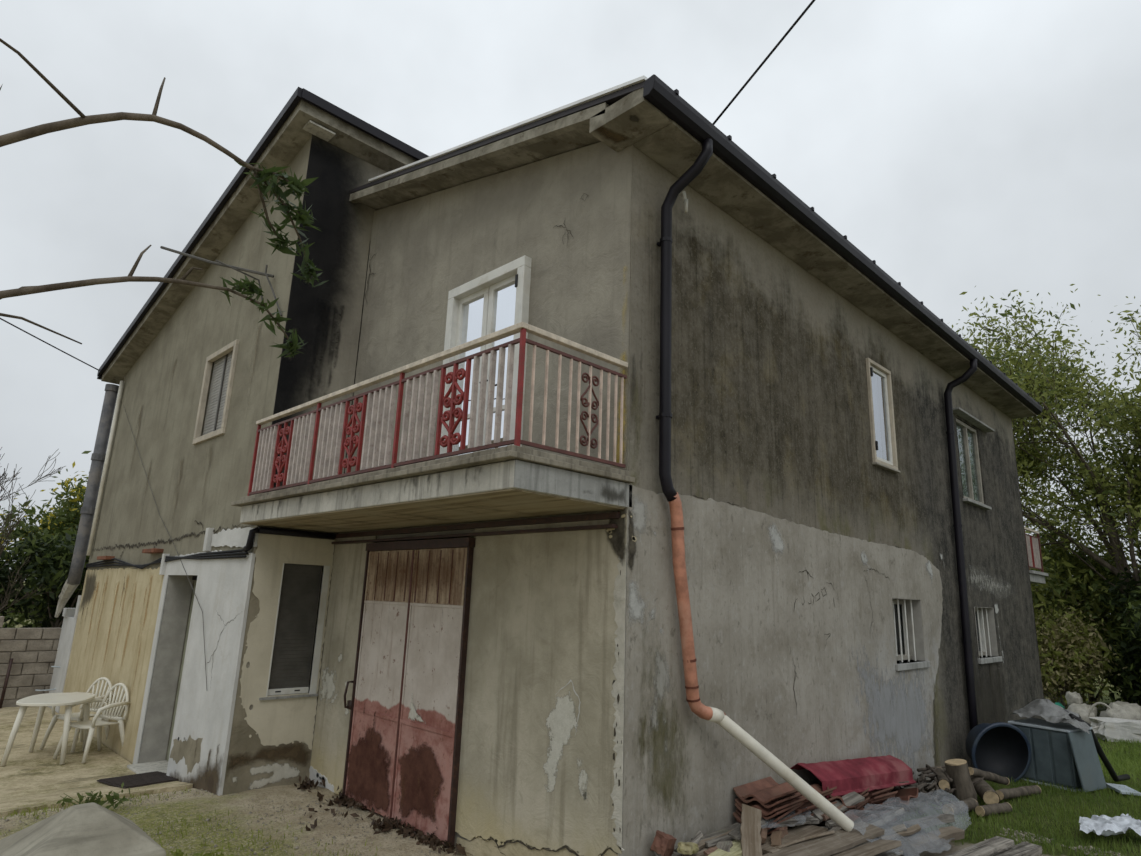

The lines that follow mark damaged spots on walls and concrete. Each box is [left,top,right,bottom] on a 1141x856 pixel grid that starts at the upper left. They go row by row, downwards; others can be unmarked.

damp [265,136,362,493]
peeling [170,735,203,774]
spalling [222,547,334,795]
spalling [457,836,580,856]
peeling [543,680,580,792]
spalling [599,489,637,856]